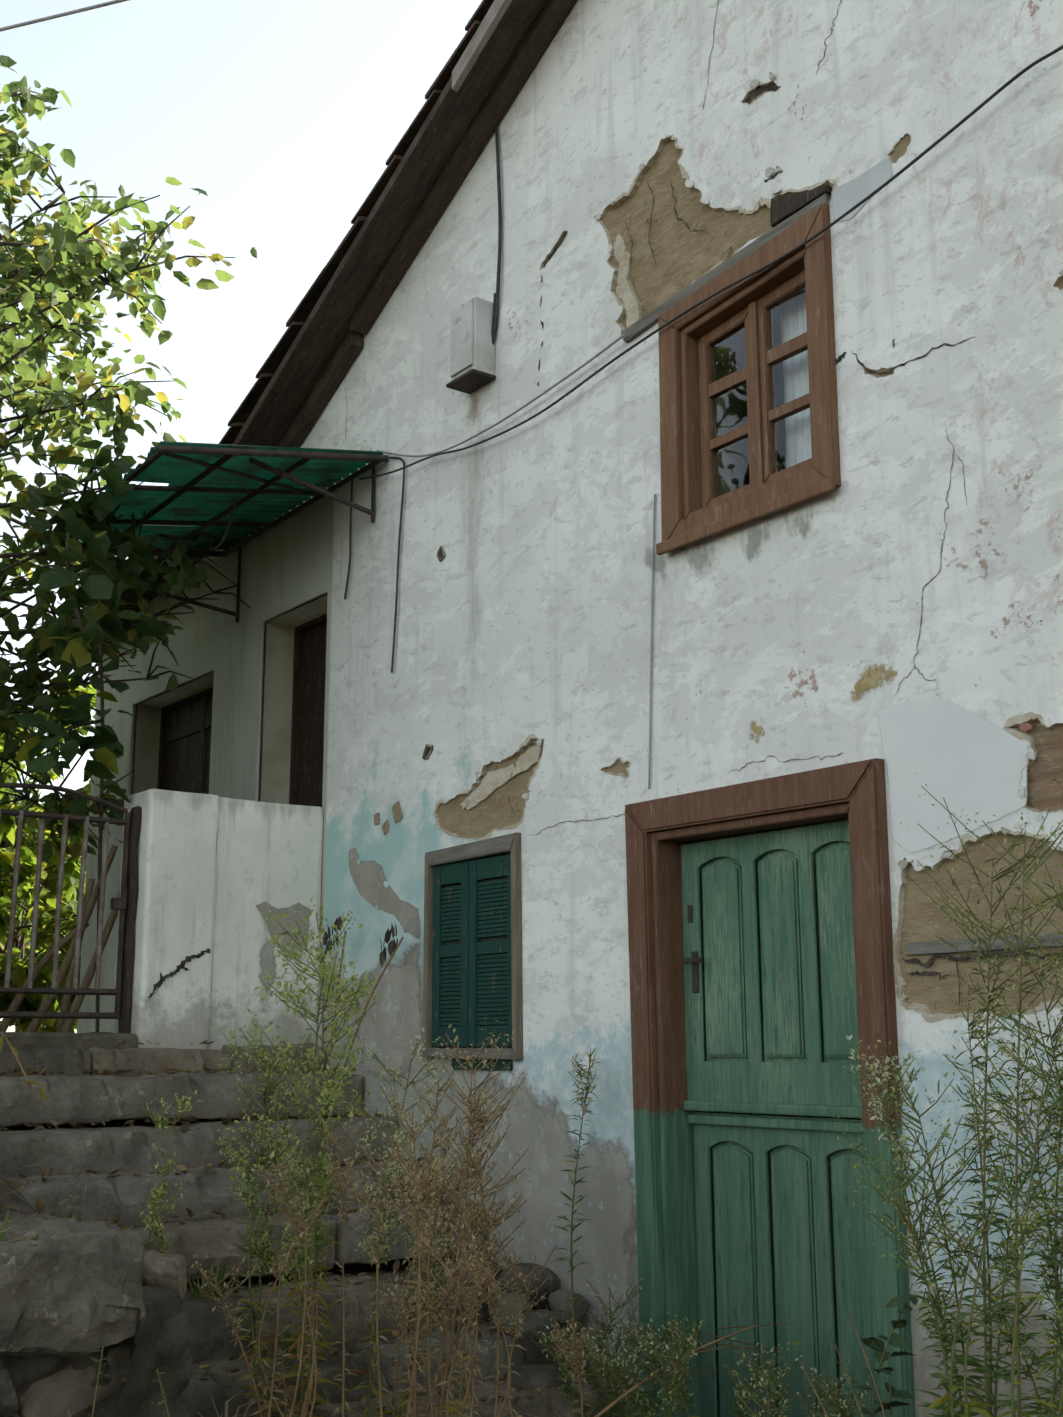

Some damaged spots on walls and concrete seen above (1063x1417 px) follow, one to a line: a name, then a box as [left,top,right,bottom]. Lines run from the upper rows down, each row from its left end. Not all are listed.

flaking render [741,71,803,120]
flaking render [593,135,837,335]
crack [835,337,973,378]
crack [895,424,967,695]
flaking render [433,734,544,841]
flaking render [1002,711,1063,813]
crack [148,948,211,998]
peeling [349,849,423,1080]
flaking render [893,827,1063,1024]